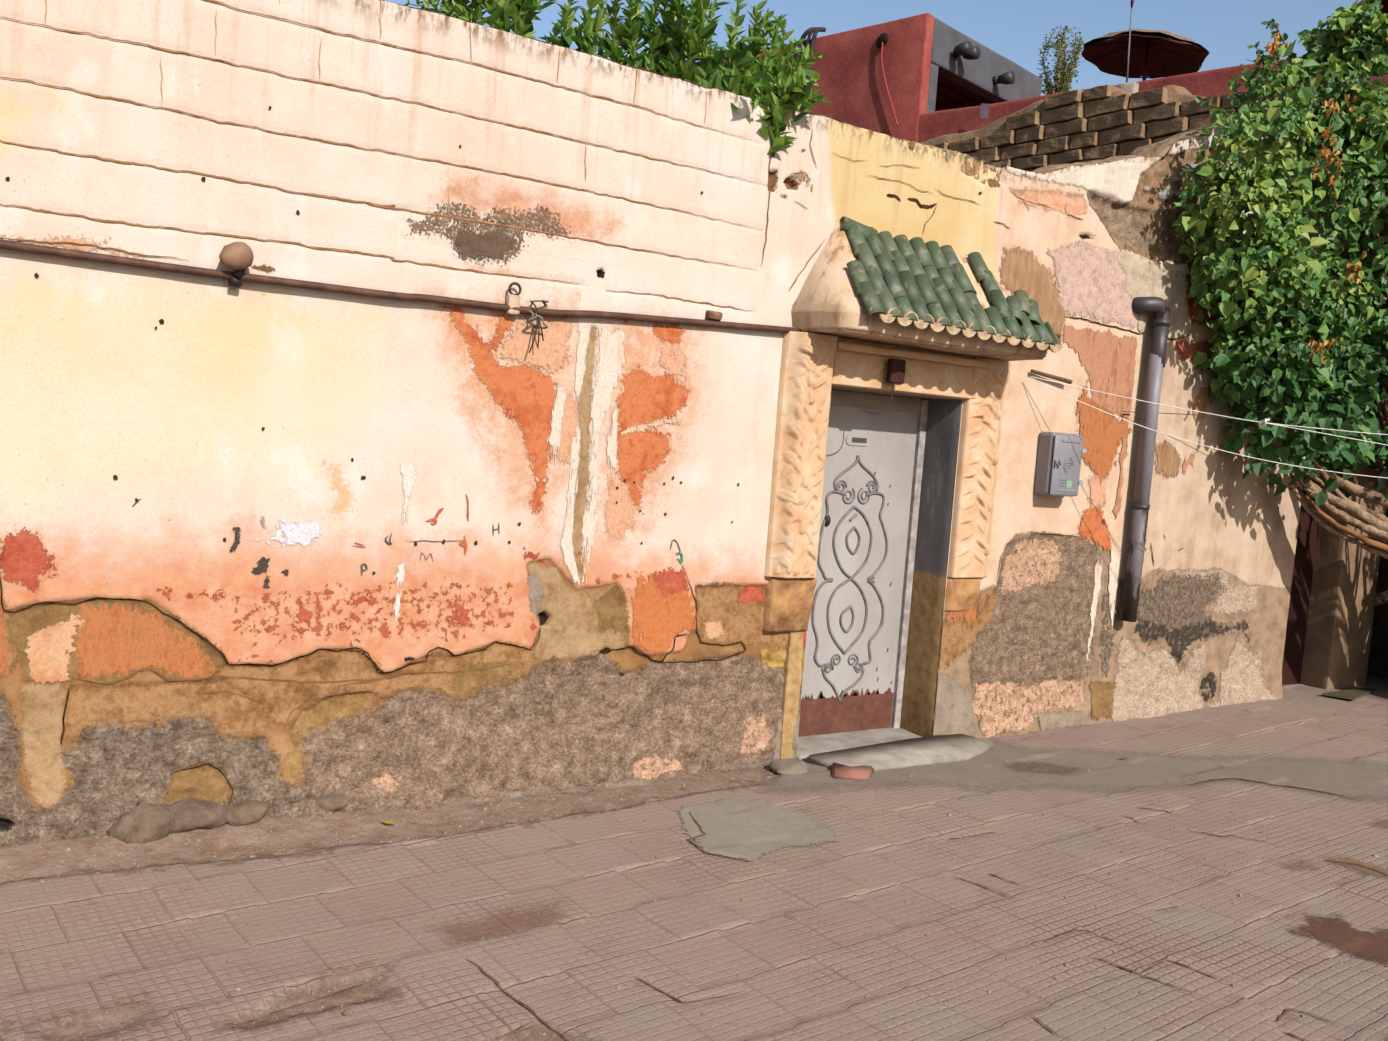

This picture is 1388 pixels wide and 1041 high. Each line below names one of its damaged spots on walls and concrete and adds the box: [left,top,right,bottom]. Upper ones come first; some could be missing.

spalling [0,527,807,849]
spalling [939,531,1102,738]
spalling [1110,635,1277,721]
spalling [1143,539,1259,615]